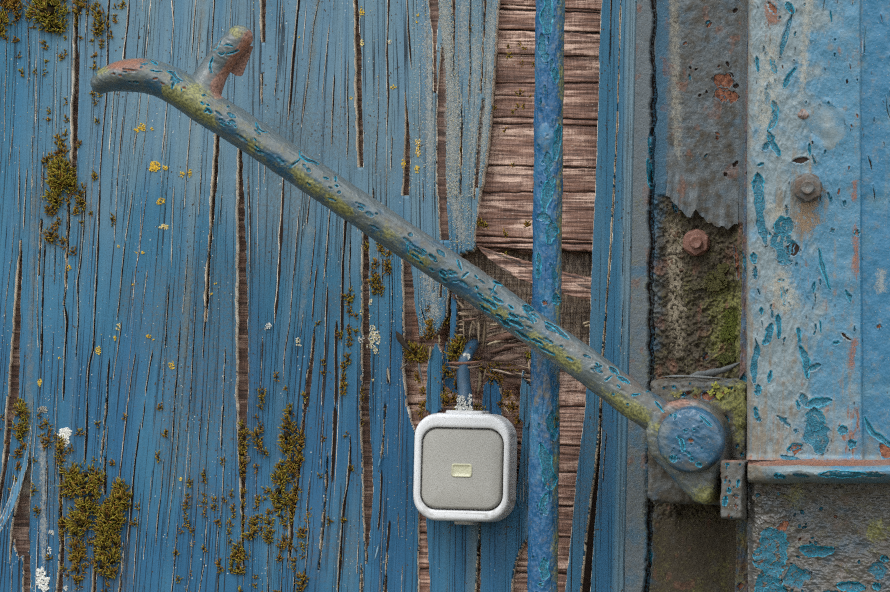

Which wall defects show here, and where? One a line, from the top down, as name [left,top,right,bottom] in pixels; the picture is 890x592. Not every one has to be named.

peeling [200,94,269,154]
crack [260,0,491,239]
corrosion [713,71,739,105]
peeling [755,2,806,157]
peeling [792,141,826,166]
peeling [742,162,800,279]
crack [0,0,442,592]
peeling [812,248,831,303]
peeling [662,279,791,423]
peeling [796,328,821,379]
peeling [752,510,835,592]
peeling [822,555,889,592]